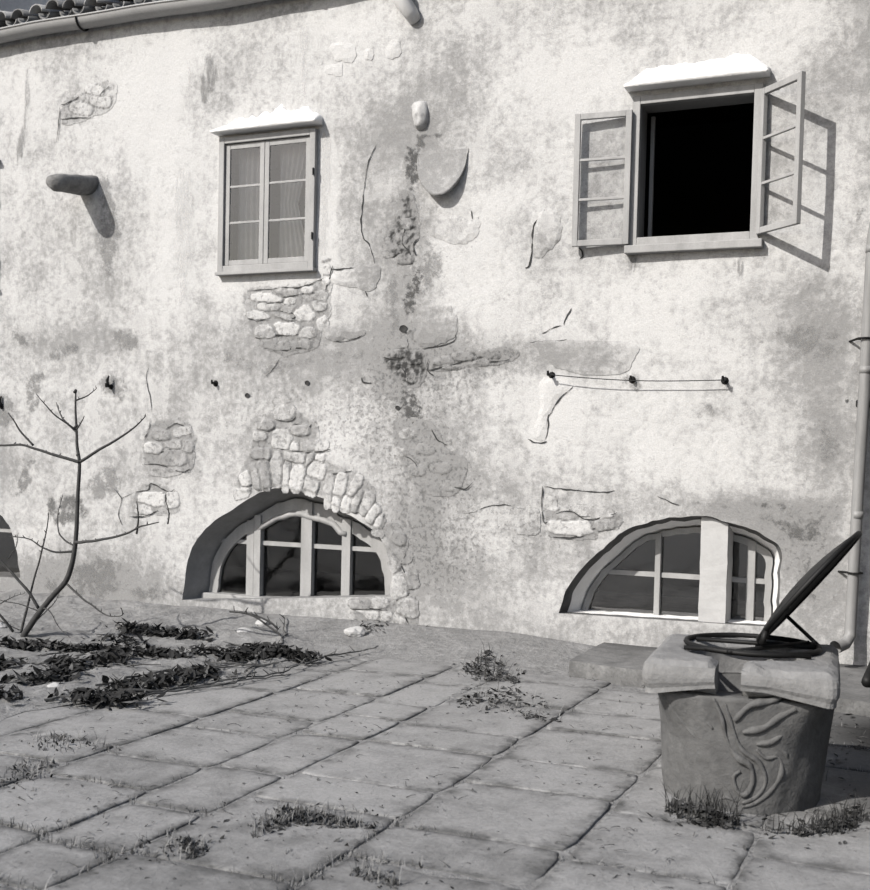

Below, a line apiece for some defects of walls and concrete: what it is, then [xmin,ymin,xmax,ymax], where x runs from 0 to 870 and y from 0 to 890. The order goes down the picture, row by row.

spalling [57,80,117,135]
spalling [241,189,481,357]
crack [360,146,376,264]
leakage [404,270,422,313]
leakage [405,134,440,190]
flaking render [526,209,563,268]
flaking render [383,300,519,388]
leakage [400,391,421,424]
flaking render [528,340,640,444]
spalling [131,419,197,518]
spalling [233,404,420,625]
spalling [511,486,623,540]